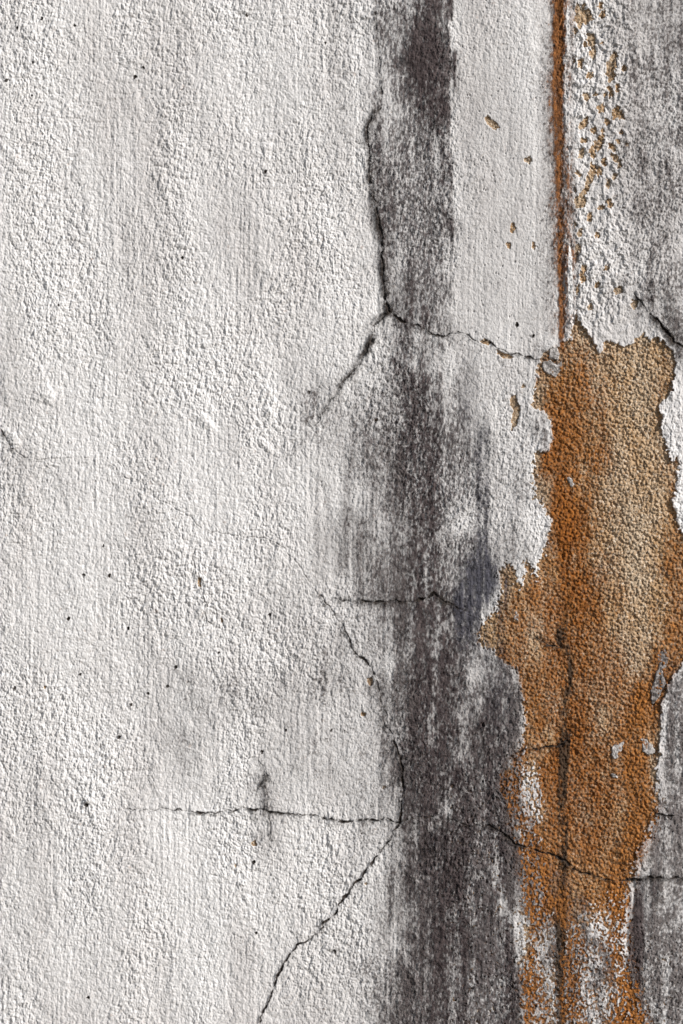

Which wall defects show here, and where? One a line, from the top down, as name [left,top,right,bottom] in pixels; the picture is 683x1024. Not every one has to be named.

crack [317,0,544,424]
peeling [573,2,629,295]
peeling [613,286,638,310]
damp [604,0,683,363]
crack [634,293,683,348]
crack [127,564,467,1023]
damp [287,0,617,1024]
crack [519,734,570,752]
peeling [450,303,683,1024]
crack [462,823,683,884]
corrosion [500,0,683,1024]